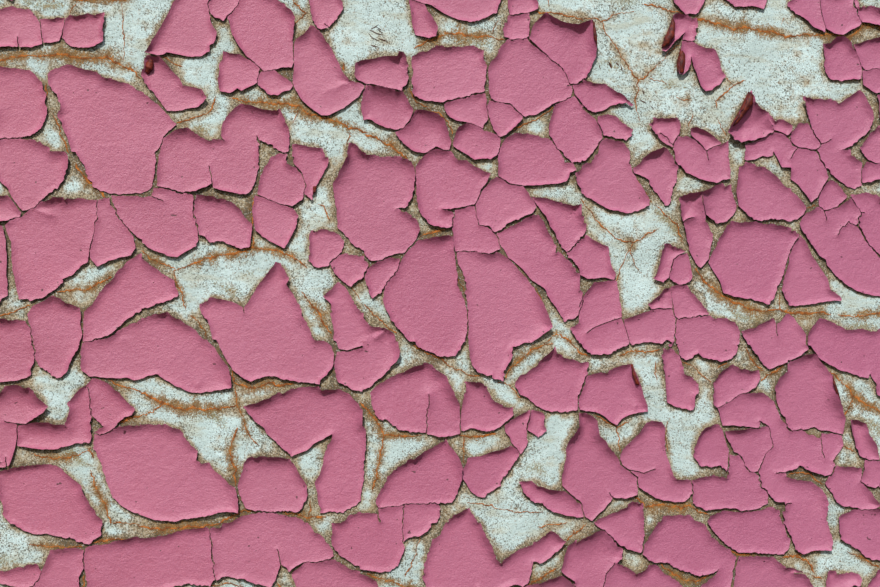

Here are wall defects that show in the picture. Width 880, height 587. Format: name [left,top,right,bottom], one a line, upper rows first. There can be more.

crack [535,0,880,126]
rust [703,17,783,40]
rust [802,22,880,41]
peeling [0,64,329,301]
crack [143,198,307,337]
crack [177,96,408,159]
peeling [141,0,880,410]
rust [145,394,222,417]
crack [109,371,293,485]
peeling [0,253,547,587]
peeling [515,314,880,560]
rust [834,373,880,415]